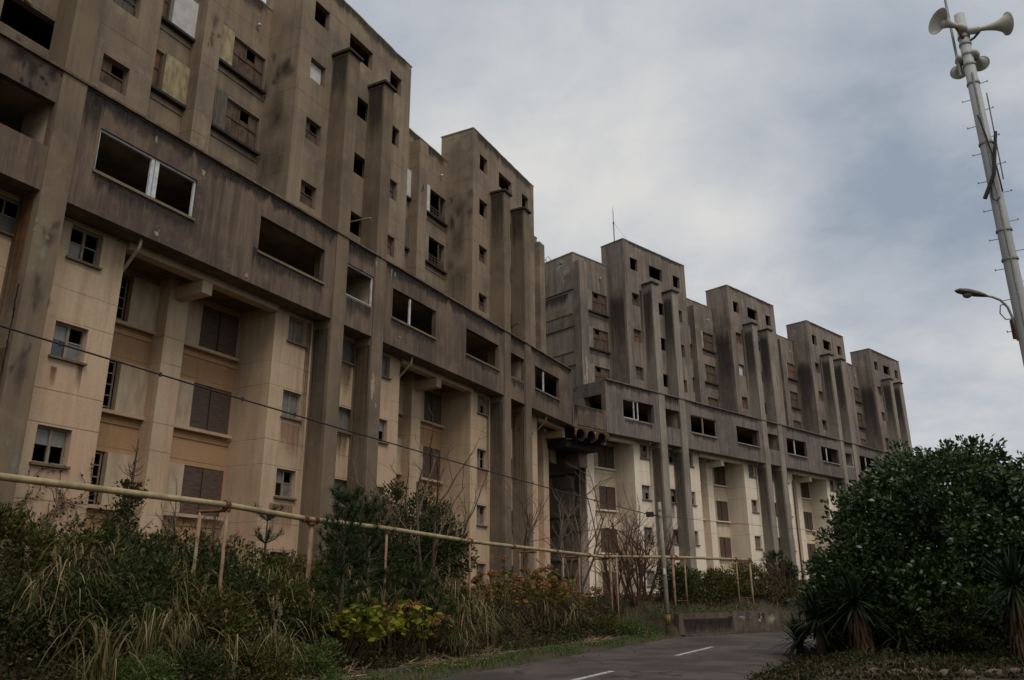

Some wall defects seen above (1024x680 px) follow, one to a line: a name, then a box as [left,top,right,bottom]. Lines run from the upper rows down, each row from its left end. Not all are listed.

leakage [85,88,335,240]
leakage [492,193,522,244]
leakage [347,241,570,373]
leakage [717,330,770,377]
leakage [797,360,844,403]
leakage [862,384,903,421]